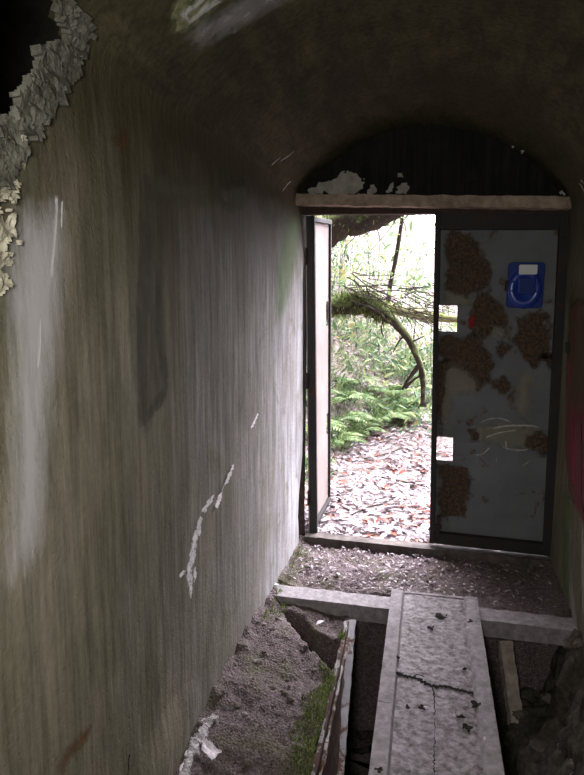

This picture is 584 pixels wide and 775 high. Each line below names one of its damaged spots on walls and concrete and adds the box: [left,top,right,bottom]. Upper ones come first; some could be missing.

flaking render [172,0,221,32]
flaking render [179,464,234,598]
crack [396,672,473,775]